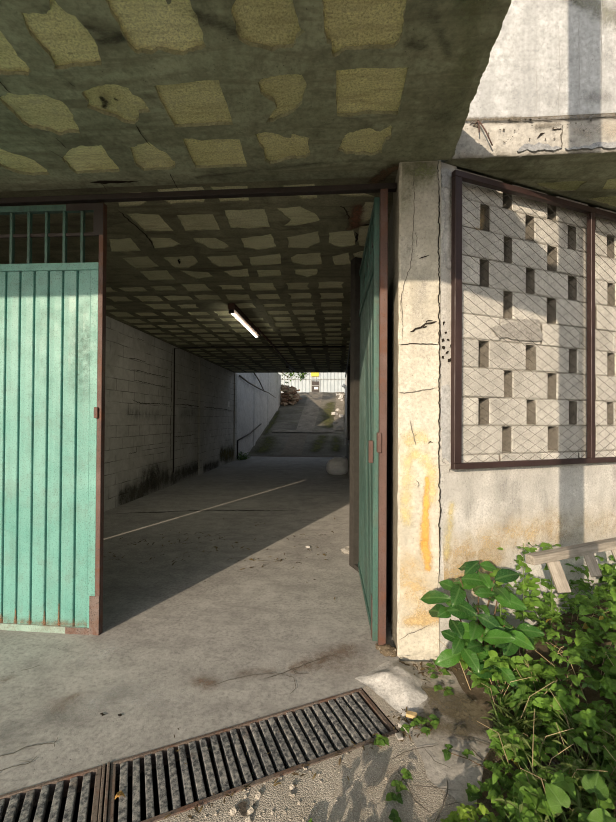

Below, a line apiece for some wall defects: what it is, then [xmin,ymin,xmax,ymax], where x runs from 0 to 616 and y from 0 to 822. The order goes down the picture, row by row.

peeling [23,0,101,66]
peeling [108,0,204,51]
peeling [232,0,301,47]
water stain [574,0,616,21]
peeling [83,84,149,121]
peeling [156,80,232,124]
spalling [495,116,606,140]
crack [399,161,442,588]
water stain [119,461,218,505]
rust [421,477,431,571]
rust [404,605,439,626]